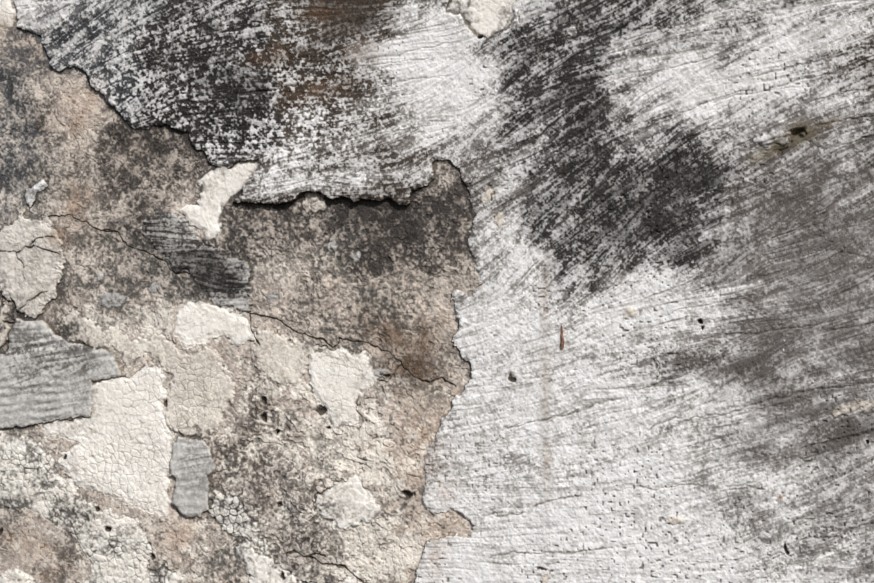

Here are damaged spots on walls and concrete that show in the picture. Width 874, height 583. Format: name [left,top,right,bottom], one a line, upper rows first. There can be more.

peeling [445,0,516,39]
spalling [482,186,496,203]
crack [0,215,190,278]
crack [0,291,48,350]
spalling [0,0,483,583]
crack [208,489,364,583]